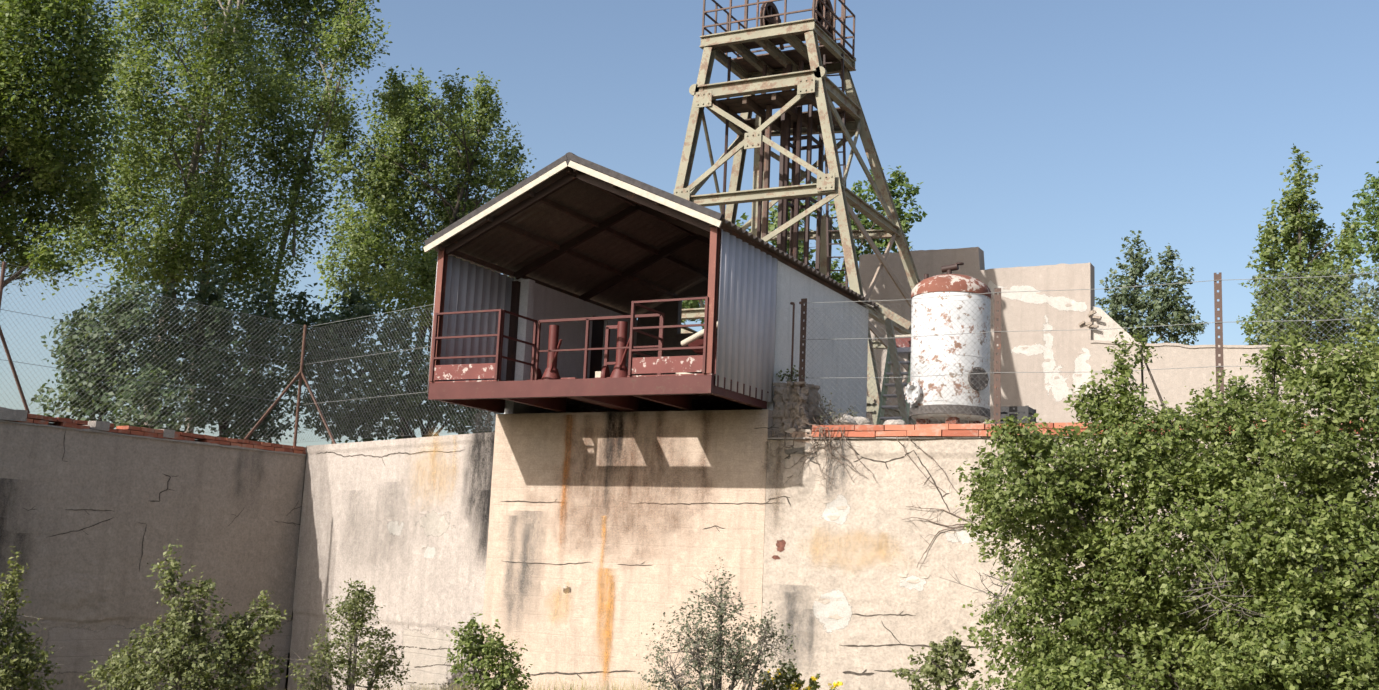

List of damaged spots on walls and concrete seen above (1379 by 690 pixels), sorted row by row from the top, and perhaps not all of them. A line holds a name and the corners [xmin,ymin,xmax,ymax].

peeling [988,280,1102,410]
damp [606,412,623,464]